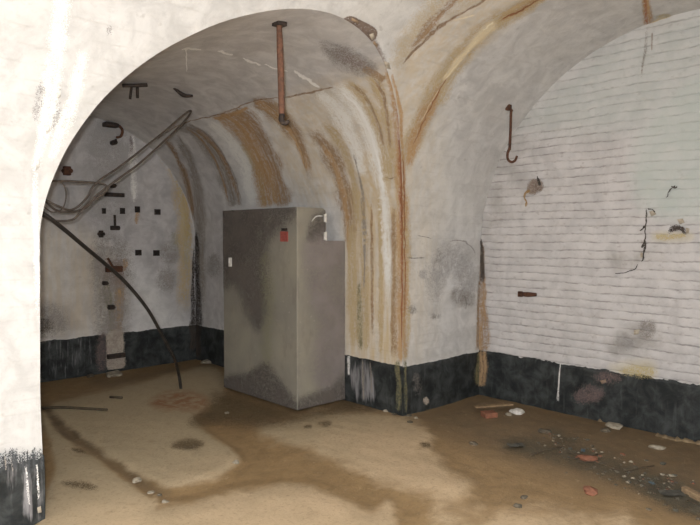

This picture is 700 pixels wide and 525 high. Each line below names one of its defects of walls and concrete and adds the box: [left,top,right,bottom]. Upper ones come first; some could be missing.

rust [162,135,207,314]
crack [158,87,333,139]
rust [214,96,366,253]
rust [345,0,547,412]
crack [615,208,656,274]
peeling [25,464,42,513]